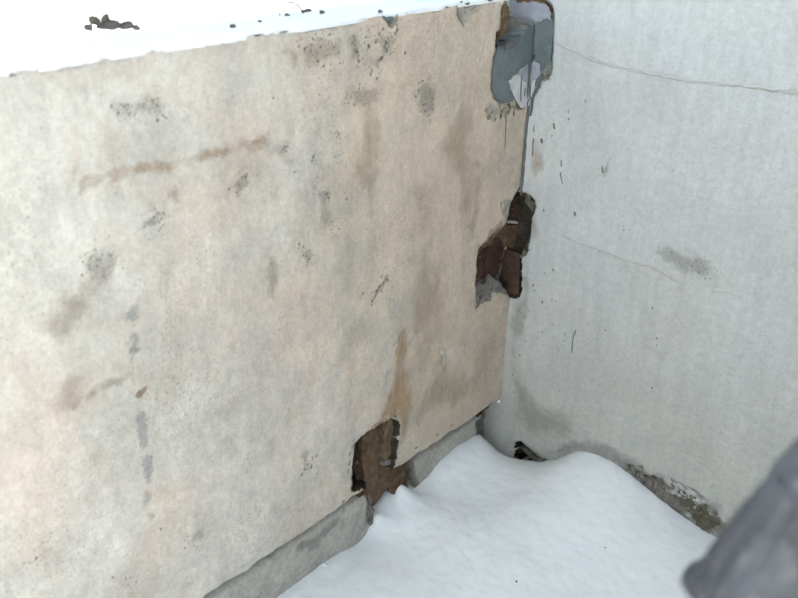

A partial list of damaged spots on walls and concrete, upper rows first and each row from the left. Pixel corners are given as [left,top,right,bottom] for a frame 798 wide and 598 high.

spalling [495,0,553,47]
peeling [484,65,552,121]
crack [555,41,798,95]
spalling [475,187,536,309]
spalling [347,415,419,526]
leakage [627,464,725,534]